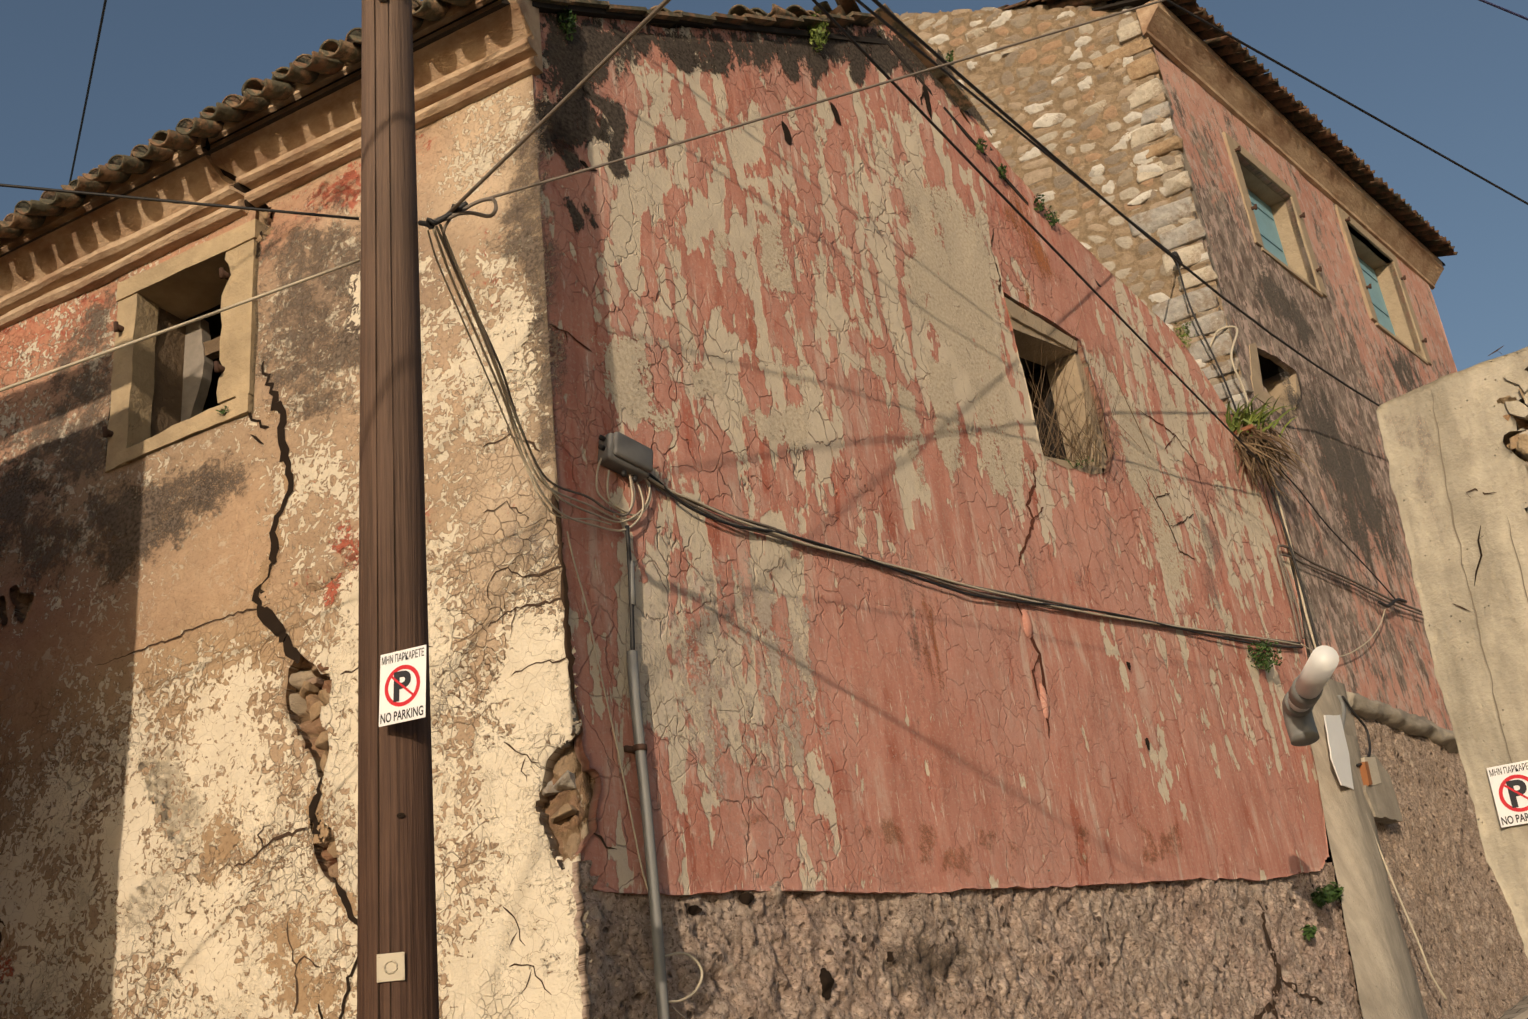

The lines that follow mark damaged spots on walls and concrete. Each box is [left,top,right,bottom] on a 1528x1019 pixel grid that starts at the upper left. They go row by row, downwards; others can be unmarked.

damp [0,279,246,602]
peeling [0,633,357,1019]
crack [98,0,432,1019]
damp [254,197,361,421]
peeling [323,517,359,837]
peeling [476,304,541,398]
crack [483,488,576,703]
peeling [475,594,599,1019]
damp [486,13,992,468]
crack [1015,460,1050,739]
crack [1254,900,1323,1019]
damp [1280,368,1399,587]